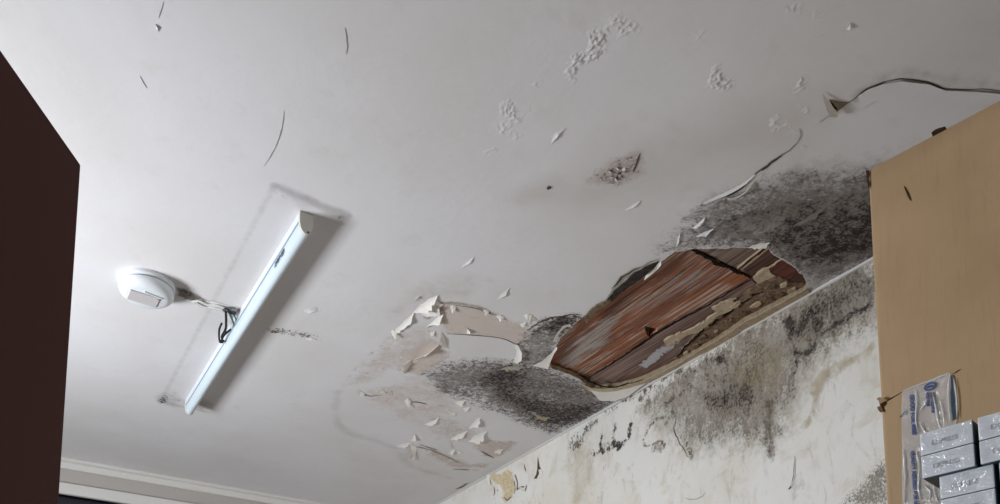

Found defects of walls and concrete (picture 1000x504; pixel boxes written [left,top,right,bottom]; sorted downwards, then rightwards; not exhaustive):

crack [822,78,1000,121]
crack [701,129,801,205]
peeling [385,295,536,374]
flaking render [583,300,611,324]
leakage [424,171,875,457]
flaking render [714,301,761,333]
peeling [397,418,513,470]
flaking render [486,470,526,502]